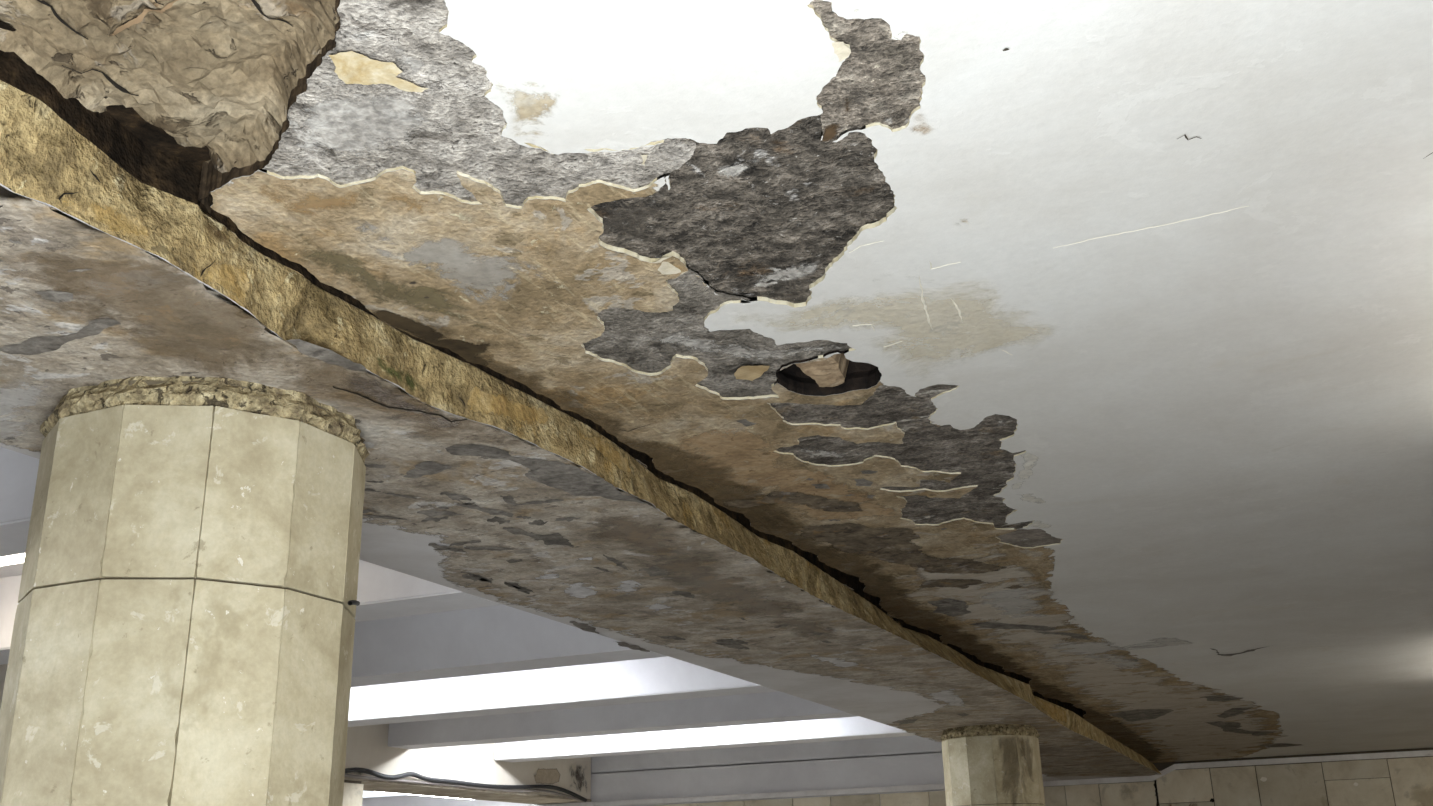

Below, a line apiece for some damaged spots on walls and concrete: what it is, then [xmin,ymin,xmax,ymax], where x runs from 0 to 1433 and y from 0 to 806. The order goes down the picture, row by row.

crack [0,21,16,31]
crack [104,96,211,168]
crack [58,170,101,204]
spalling [0,0,1095,641]
crack [333,386,467,423]
crack [623,424,653,469]
crack [841,572,894,620]
peeling [617,636,686,652]
peeling [712,639,750,650]
peeling [1110,709,1174,722]
peeling [1201,695,1302,747]
crack [1152,780,1160,806]